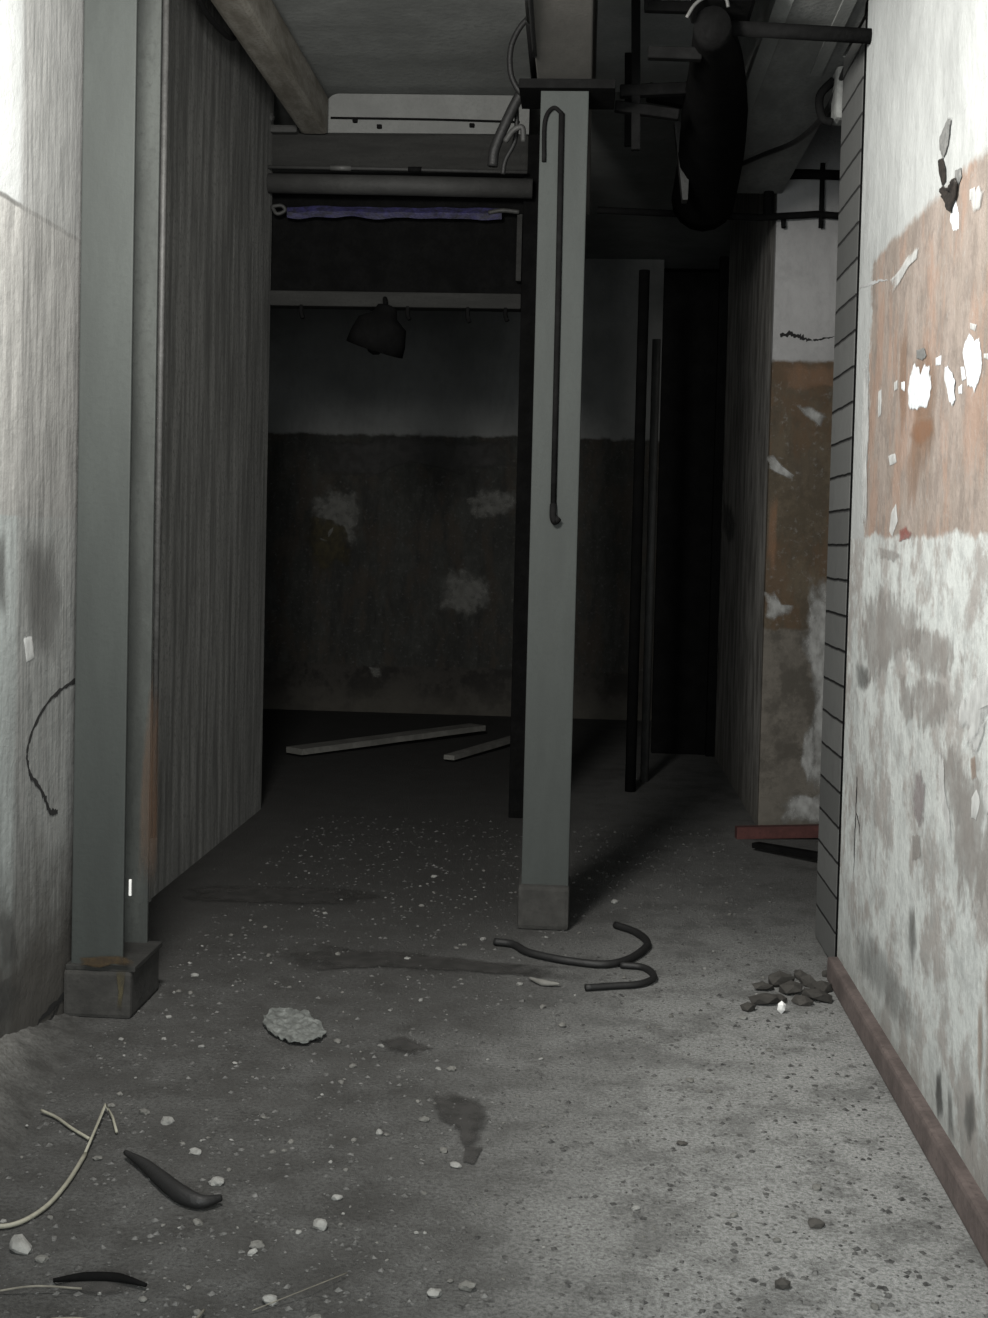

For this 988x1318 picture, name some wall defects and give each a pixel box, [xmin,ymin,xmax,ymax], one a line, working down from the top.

spalling [938,119,982,231]
peeling [892,250,917,286]
peeling [799,407,824,425]
peeling [862,323,988,518]
peeling [768,457,793,477]
peeling [767,595,791,618]
water stain [936,1076,950,1119]